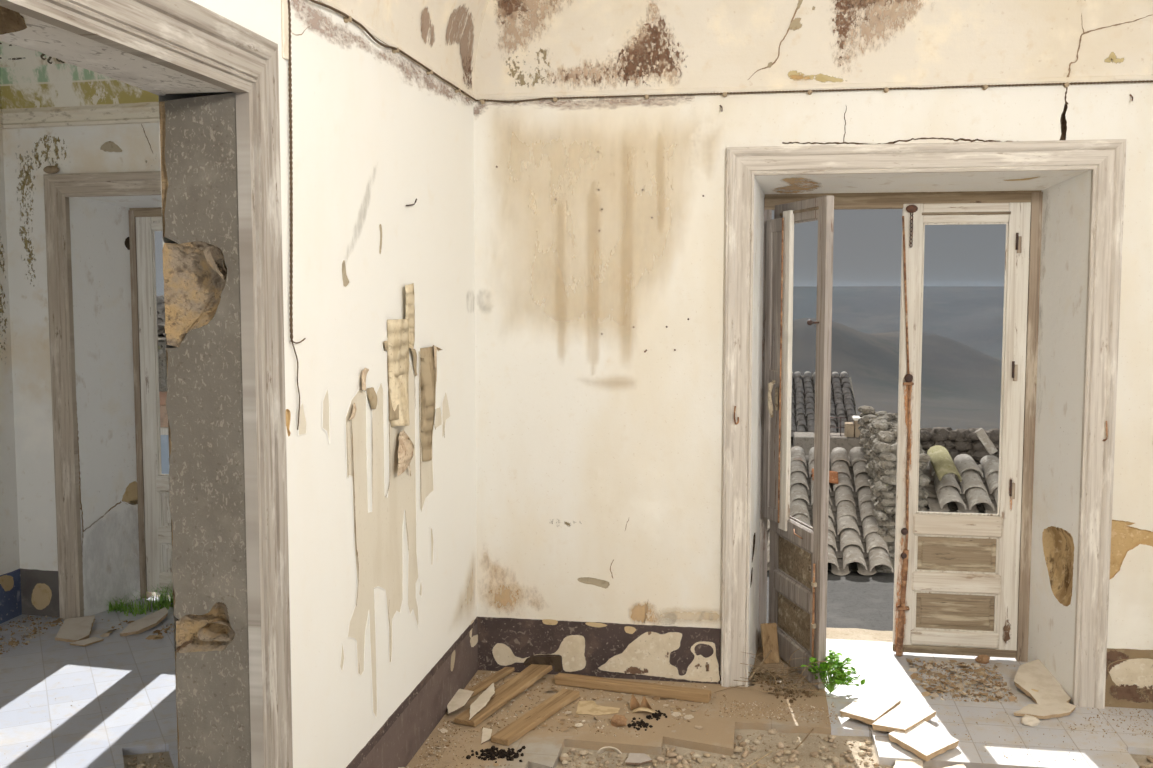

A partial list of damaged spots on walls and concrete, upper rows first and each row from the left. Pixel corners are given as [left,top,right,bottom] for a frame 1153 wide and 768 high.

water stain [498,0,685,86]
crack [748,0,815,80]
water stain [832,0,920,66]
crack [1060,15,1151,140]
water stain [17,135,67,286]
peeling [286,401,307,437]
peeling [339,283,451,718]
peeling [0,574,15,592]
peeling [31,582,53,611]
flaking render [1042,526,1074,606]
flaking render [1110,520,1153,579]
peeling [491,622,721,683]